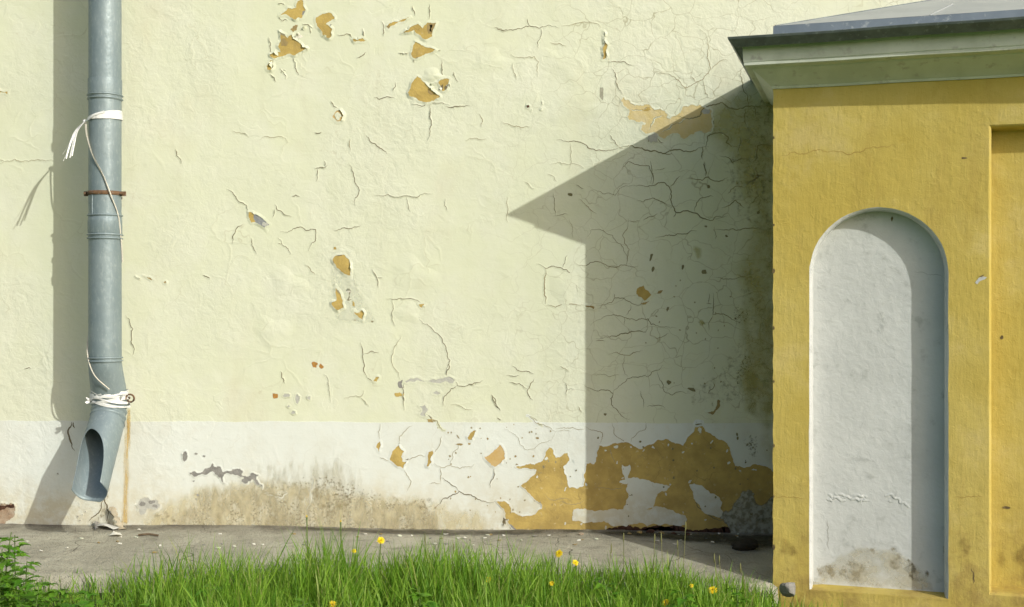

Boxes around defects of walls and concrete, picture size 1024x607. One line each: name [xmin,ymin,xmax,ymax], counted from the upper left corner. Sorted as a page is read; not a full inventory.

peeling [264,0,368,83]
peeling [380,4,459,141]
peeling [599,29,714,143]
peeling [329,247,374,323]
crack [323,19,895,510]
flaking render [181,449,264,490]
water stain [154,477,541,534]
peeling [374,397,775,531]